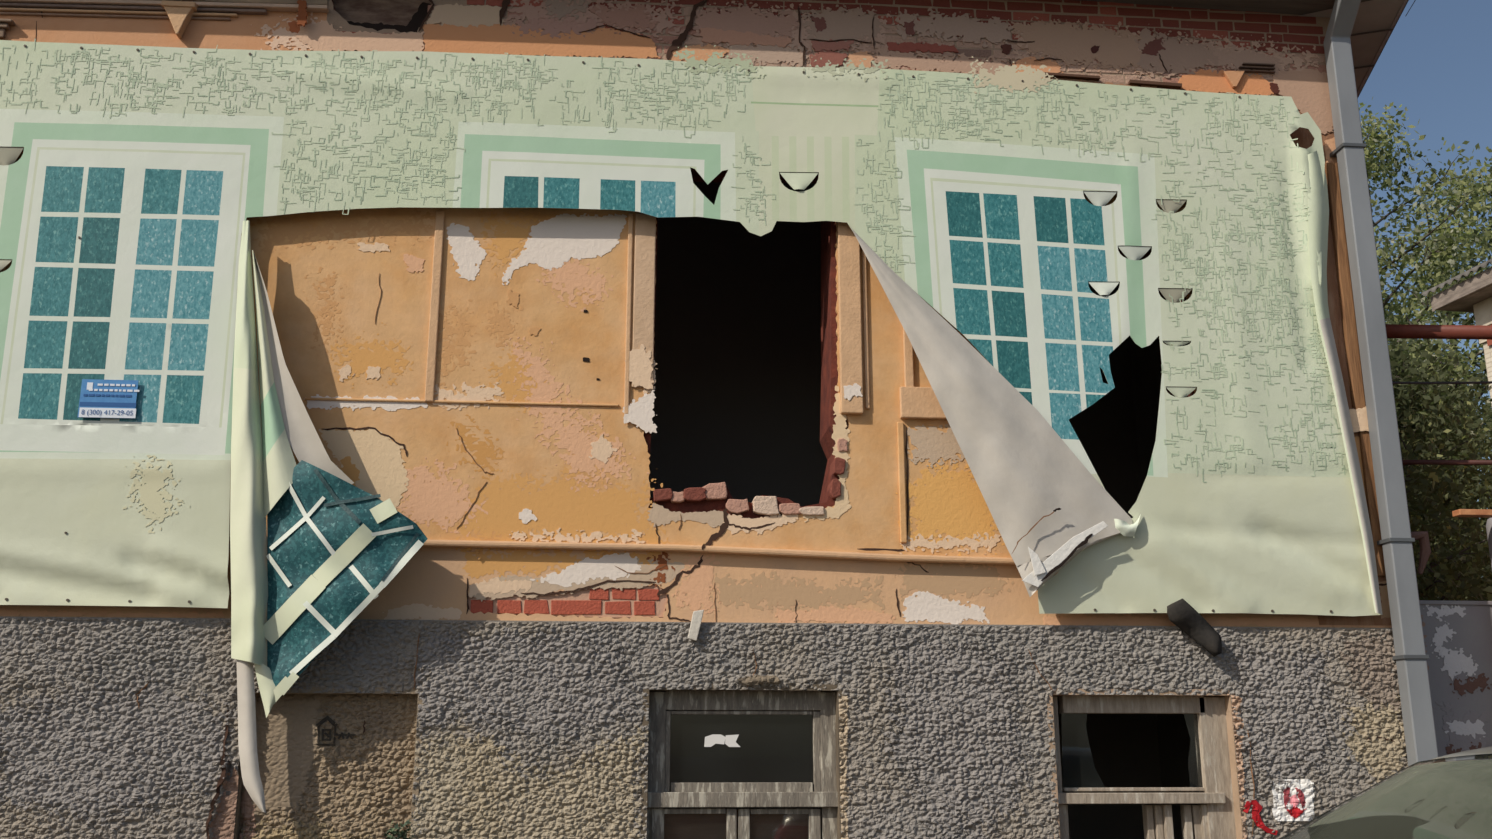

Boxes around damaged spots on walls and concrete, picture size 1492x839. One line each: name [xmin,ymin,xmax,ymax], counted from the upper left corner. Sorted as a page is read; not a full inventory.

crack [579,0,707,60]
peeling [446,223,487,281]
peeling [502,213,627,308]
crack [323,427,407,456]
crack [456,430,494,529]
flaking render [382,383,863,620]
crack [522,508,774,622]
peeling [775,591,990,624]
crack [206,710,228,839]
peeling [839,696,849,839]